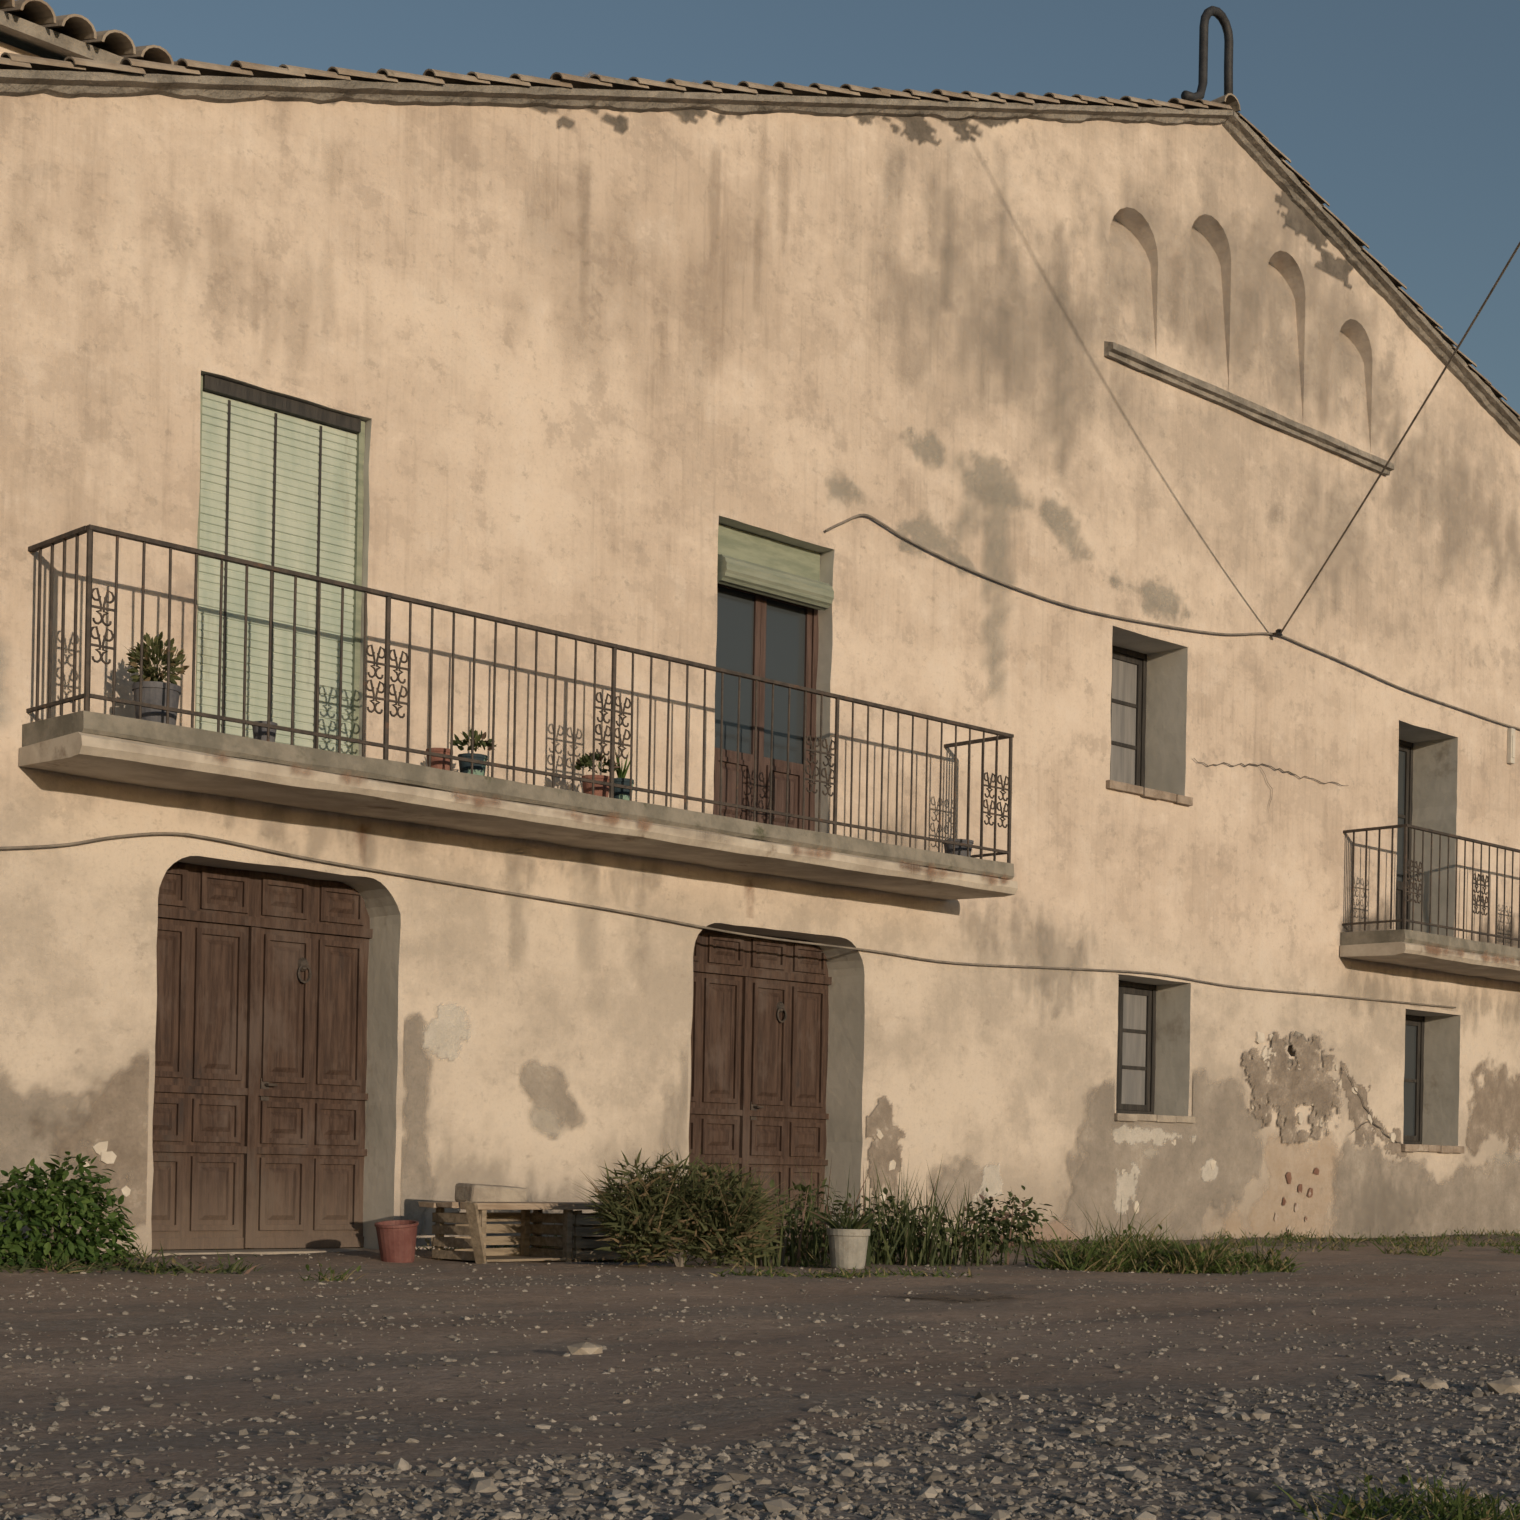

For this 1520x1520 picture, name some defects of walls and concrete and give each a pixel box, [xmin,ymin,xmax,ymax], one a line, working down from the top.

peeling [521,1062,583,1132]
peeling [866,1096,906,1216]
spalling [1242,1031,1407,1163]
peeling [1466,1063,1520,1156]